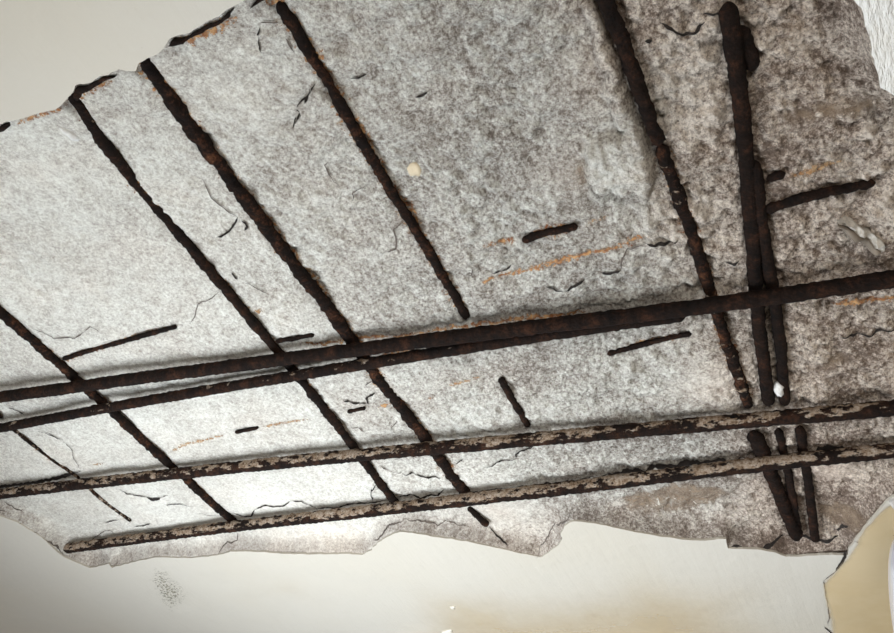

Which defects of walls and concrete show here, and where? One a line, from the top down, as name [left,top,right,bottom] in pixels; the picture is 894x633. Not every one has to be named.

corrosion [407,162,422,176]
spalling [150,0,894,342]
spalling [0,58,363,391]
corrosion [482,235,646,285]
corrosion [357,309,584,340]
crack [119,451,753,555]
spalling [0,270,894,566]
crack [490,446,533,467]